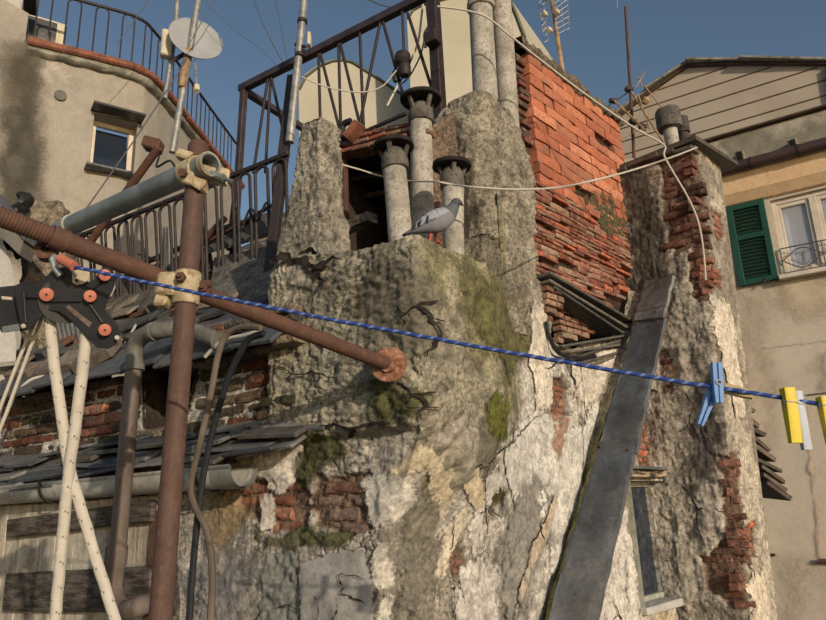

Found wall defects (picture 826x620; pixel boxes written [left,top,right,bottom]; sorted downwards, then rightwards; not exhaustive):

leakage [0,41,76,205]
peeling [242,434,308,534]
crack [234,552,364,620]
crack [396,300,445,357]
peeling [319,301,617,620]
flaking render [661,155,743,387]
flaking render [702,451,771,620]
peeling [732,396,746,418]